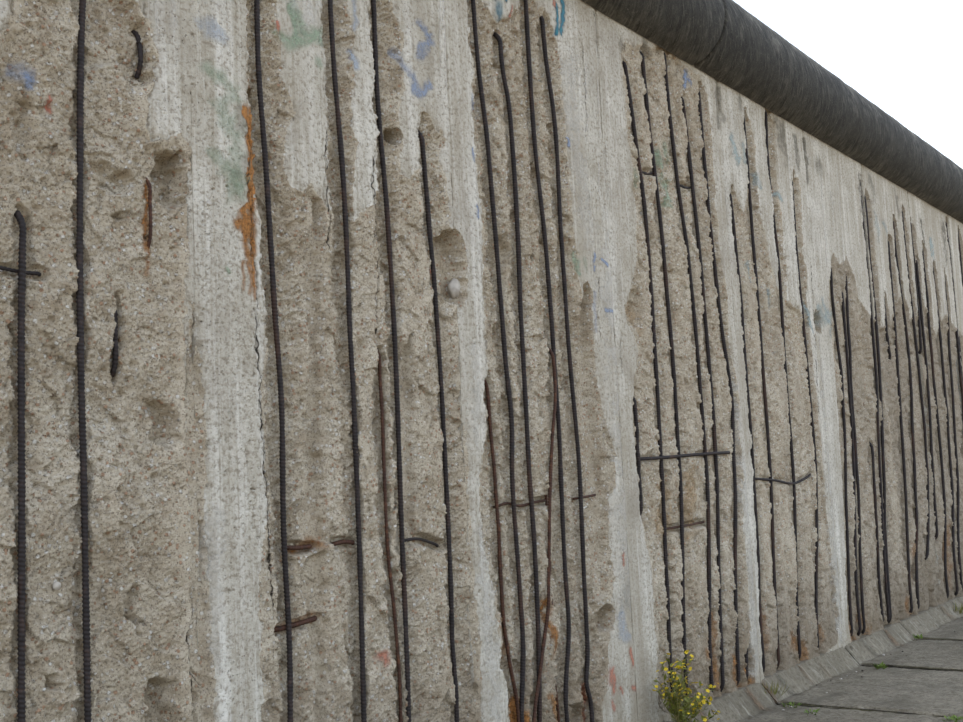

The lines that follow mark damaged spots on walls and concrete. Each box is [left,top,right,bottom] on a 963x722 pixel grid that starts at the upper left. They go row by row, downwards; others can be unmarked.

spalling [0,0,217,722]
rust [234,105,257,299]
spalling [258,347,283,722]
spalling [288,183,353,722]
spalling [350,202,400,722]
spalling [395,169,468,722]
rust [508,696,530,722]
spalling [462,0,583,722]
spalling [605,41,752,718]
spalling [733,189,963,675]